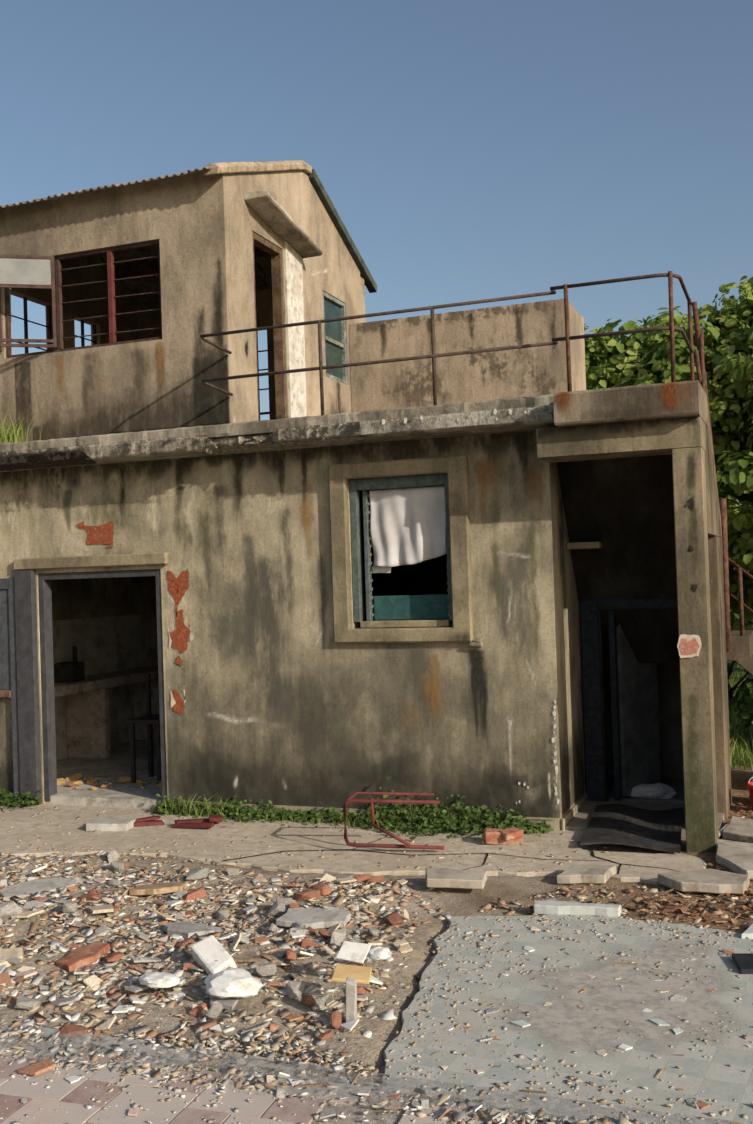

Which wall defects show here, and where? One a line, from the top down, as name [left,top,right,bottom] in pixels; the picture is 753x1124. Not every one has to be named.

leakage [0,294,714,526]
leakage [218,537,292,655]
leakage [315,558,326,645]
leakage [490,528,535,642]
leakage [458,635,487,733]